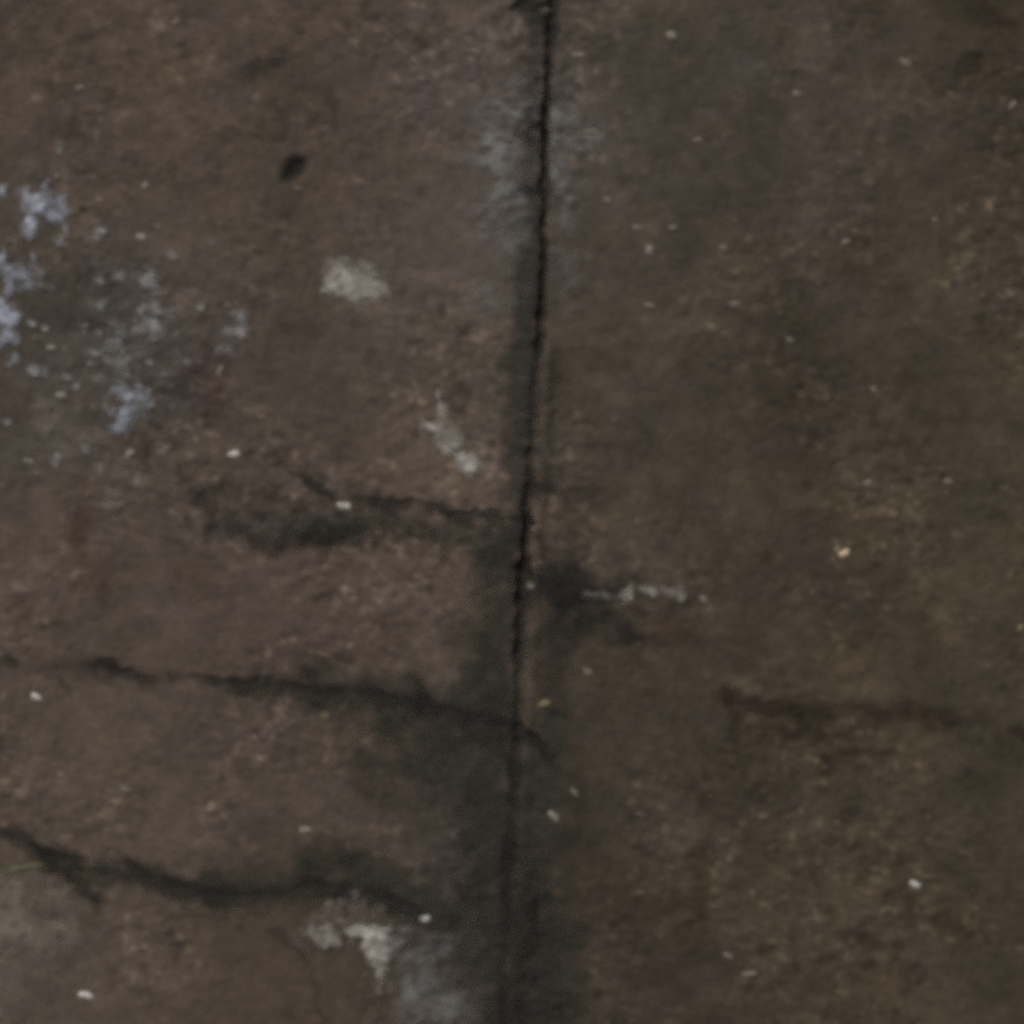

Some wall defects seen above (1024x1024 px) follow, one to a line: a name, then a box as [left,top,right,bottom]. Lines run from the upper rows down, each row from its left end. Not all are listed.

damp [323,258,388,303]
damp [473,100,542,500]
crack [513,0,560,370]
crack [0,829,100,898]
crack [125,857,421,914]
crack [81,411,580,904]
damp [347,516,584,1024]